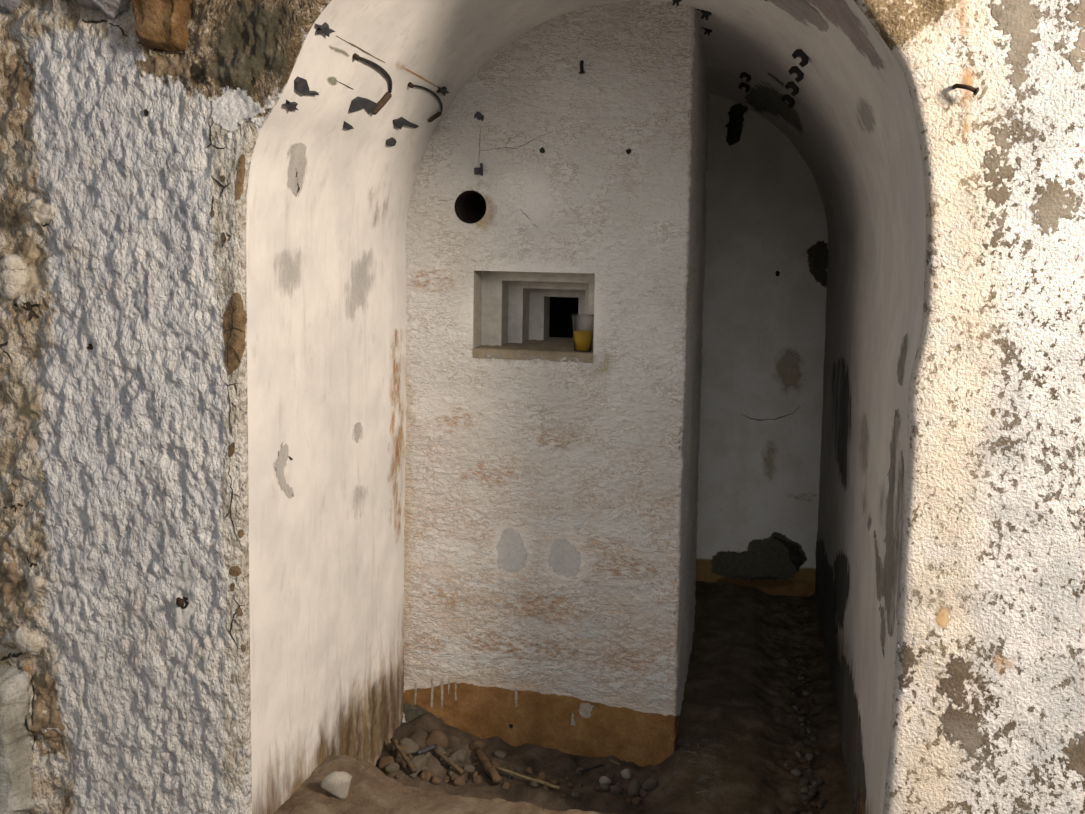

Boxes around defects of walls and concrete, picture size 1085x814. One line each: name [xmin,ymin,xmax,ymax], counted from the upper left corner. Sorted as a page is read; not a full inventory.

spalling [4,47,36,111]
flaking render [76,0,193,79]
peeling [764,0,883,68]
peeling [988,0,1041,95]
peeling [1060,0,1085,72]
peeling [979,122,1083,256]
peeling [807,241,828,287]
spalling [223,292,247,375]
damp [832,359,851,489]
damp [317,684,447,766]
peeling [934,645,989,760]
peeling [1060,731,1085,777]